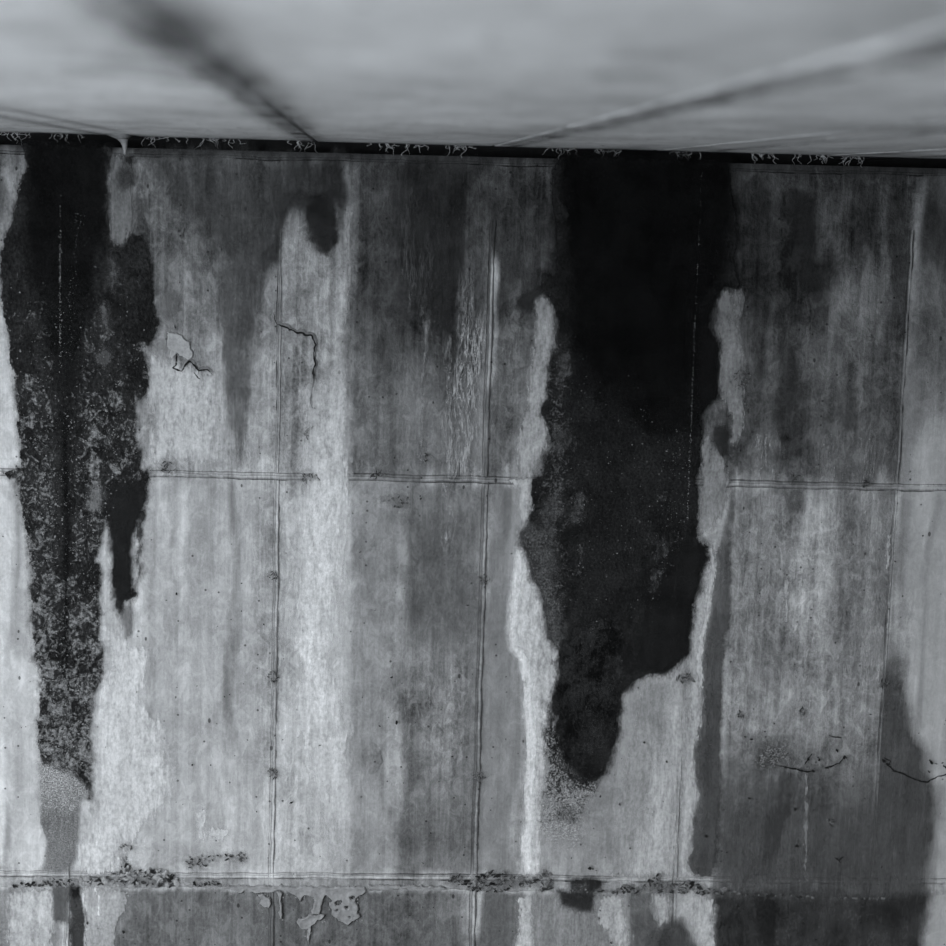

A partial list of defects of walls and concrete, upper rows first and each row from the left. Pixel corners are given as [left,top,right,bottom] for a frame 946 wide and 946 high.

peeling [167,332,194,360]
crack [273,312,327,456]
damp [0,128,219,875]
damp [507,149,935,946]
crack [776,735,848,773]
crack [882,757,946,783]
damp [7,886,129,946]
peeling [224,884,445,943]